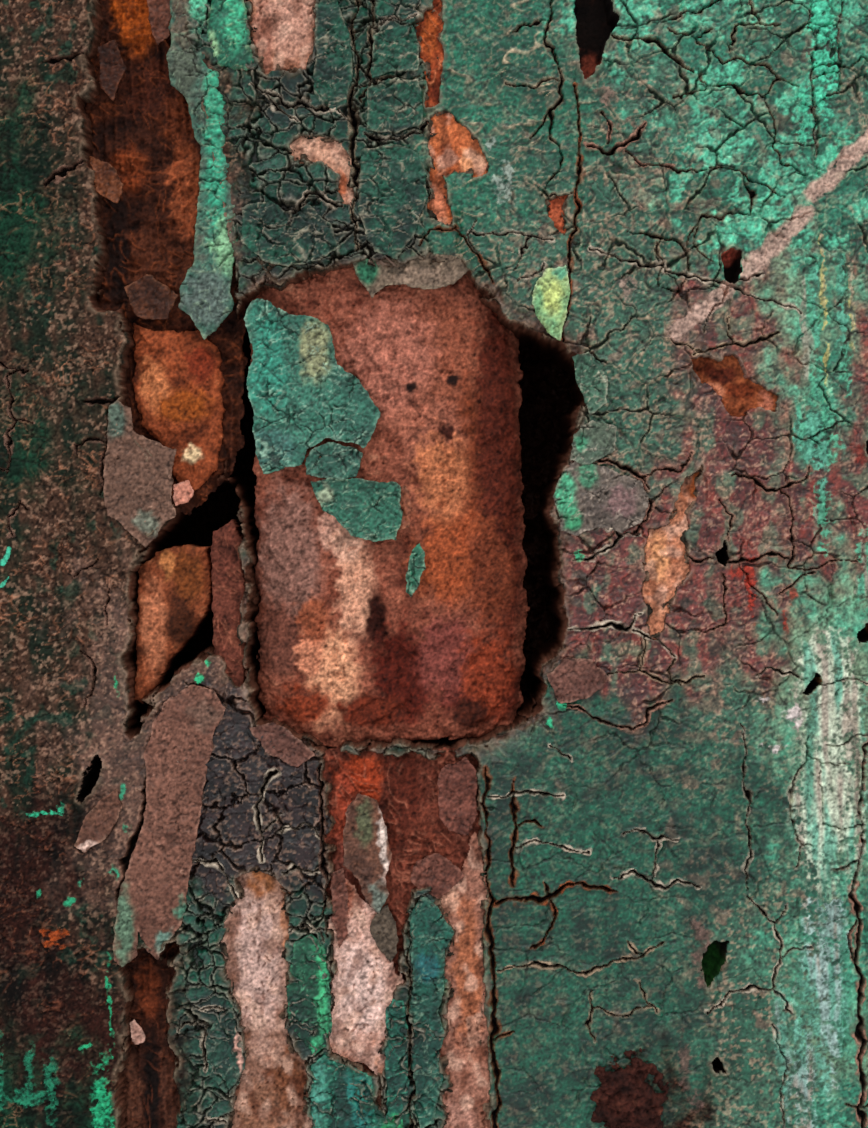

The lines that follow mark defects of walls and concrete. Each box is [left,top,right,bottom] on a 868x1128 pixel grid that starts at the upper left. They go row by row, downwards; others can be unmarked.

peeling [89,156,124,203]
crack [249,0,429,251]
crack [419,0,864,356]
peeling [532,265,570,341]
spalling [691,355,778,417]
spalling [103,0,530,1128]
rust [730,558,757,617]
crack [689,465,861,633]
peeling [547,657,609,703]
rust [39,929,68,949]
crack [481,767,701,1128]
crack [788,734,868,1128]